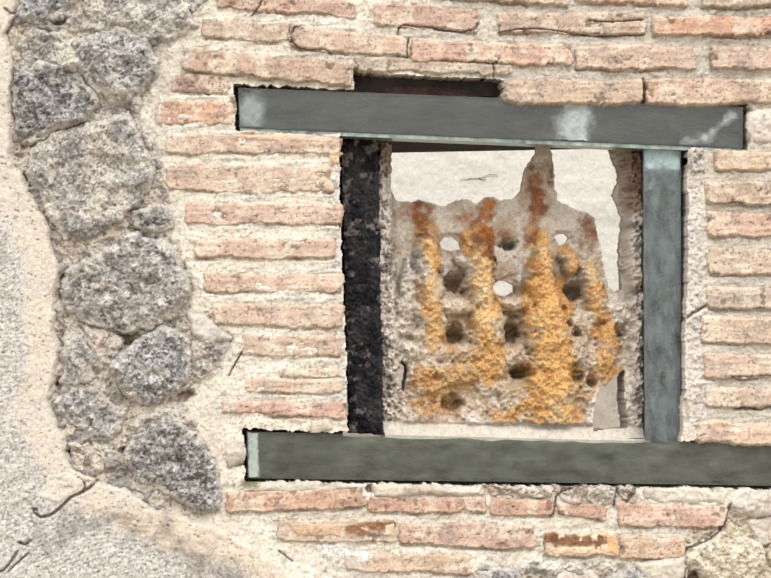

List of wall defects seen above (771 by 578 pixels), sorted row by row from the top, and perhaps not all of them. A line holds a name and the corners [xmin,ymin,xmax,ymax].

rust [405,198,516,418]
rust [494,165,621,425]
crack [33,482,95,518]
flaking render [39,452,94,503]
crack [0,541,30,572]